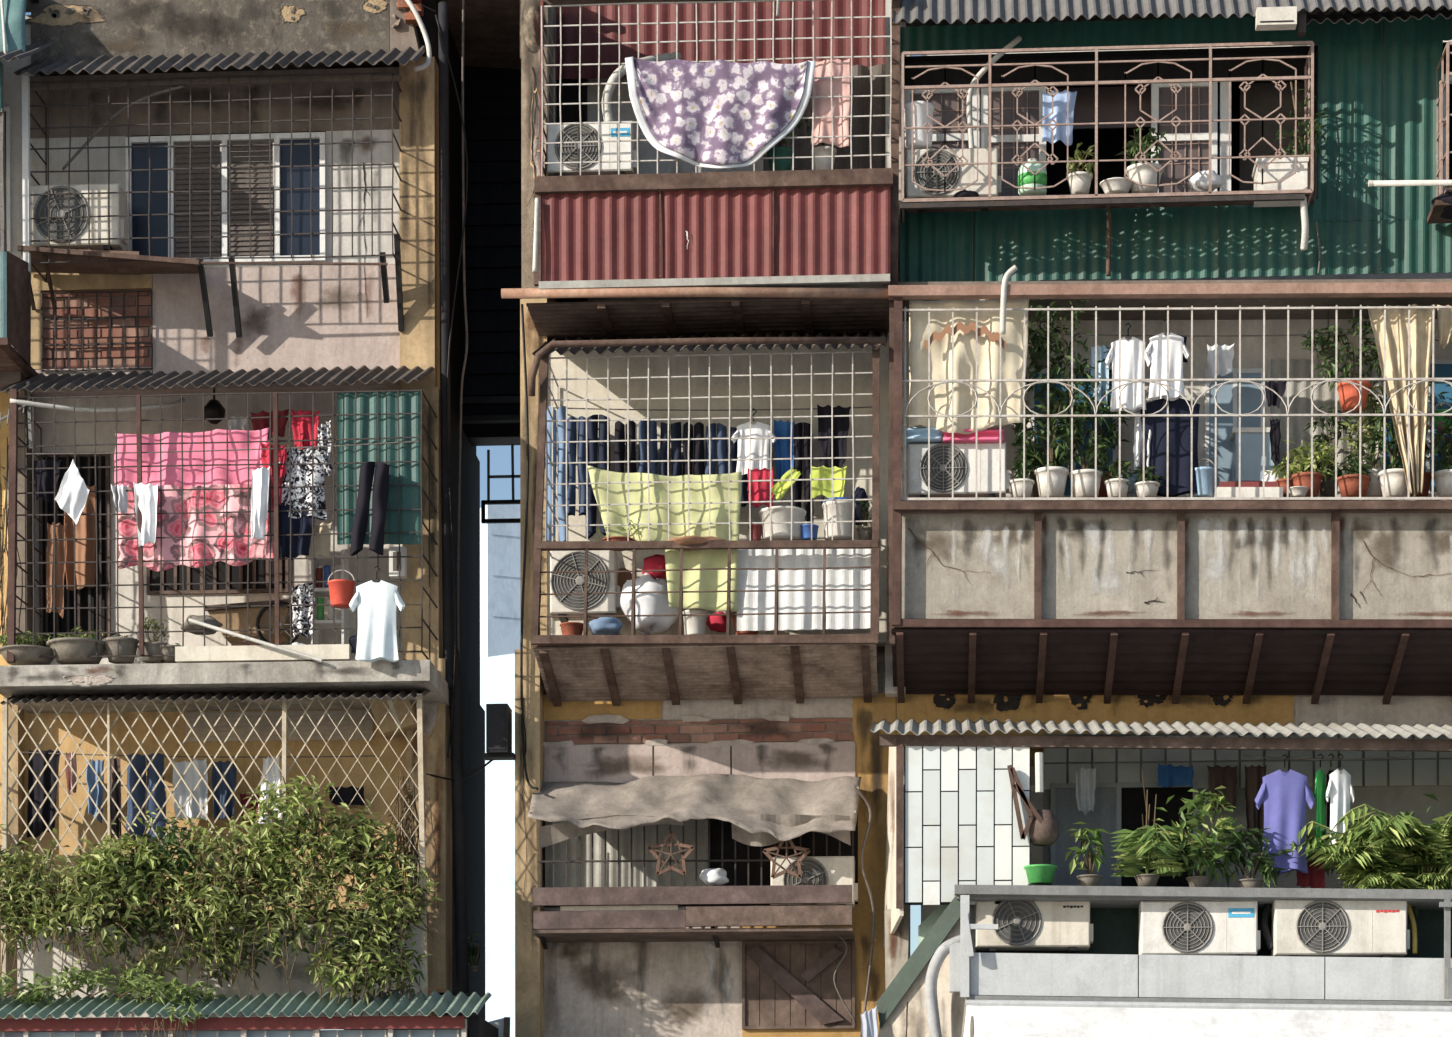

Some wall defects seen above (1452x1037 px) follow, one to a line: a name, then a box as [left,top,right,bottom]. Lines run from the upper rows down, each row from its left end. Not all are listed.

spalling [25,2,108,28]
spalling [278,3,307,24]
flaking render [359,0,424,27]
crack [908,528,990,582]
damp [915,523,1028,573]
damp [1059,519,1118,589]
damp [1134,525,1151,550]
damp [1198,519,1327,582]
crack [1350,541,1444,608]
damp [581,726,659,774]
damp [783,745,830,764]
damp [673,943,731,1020]